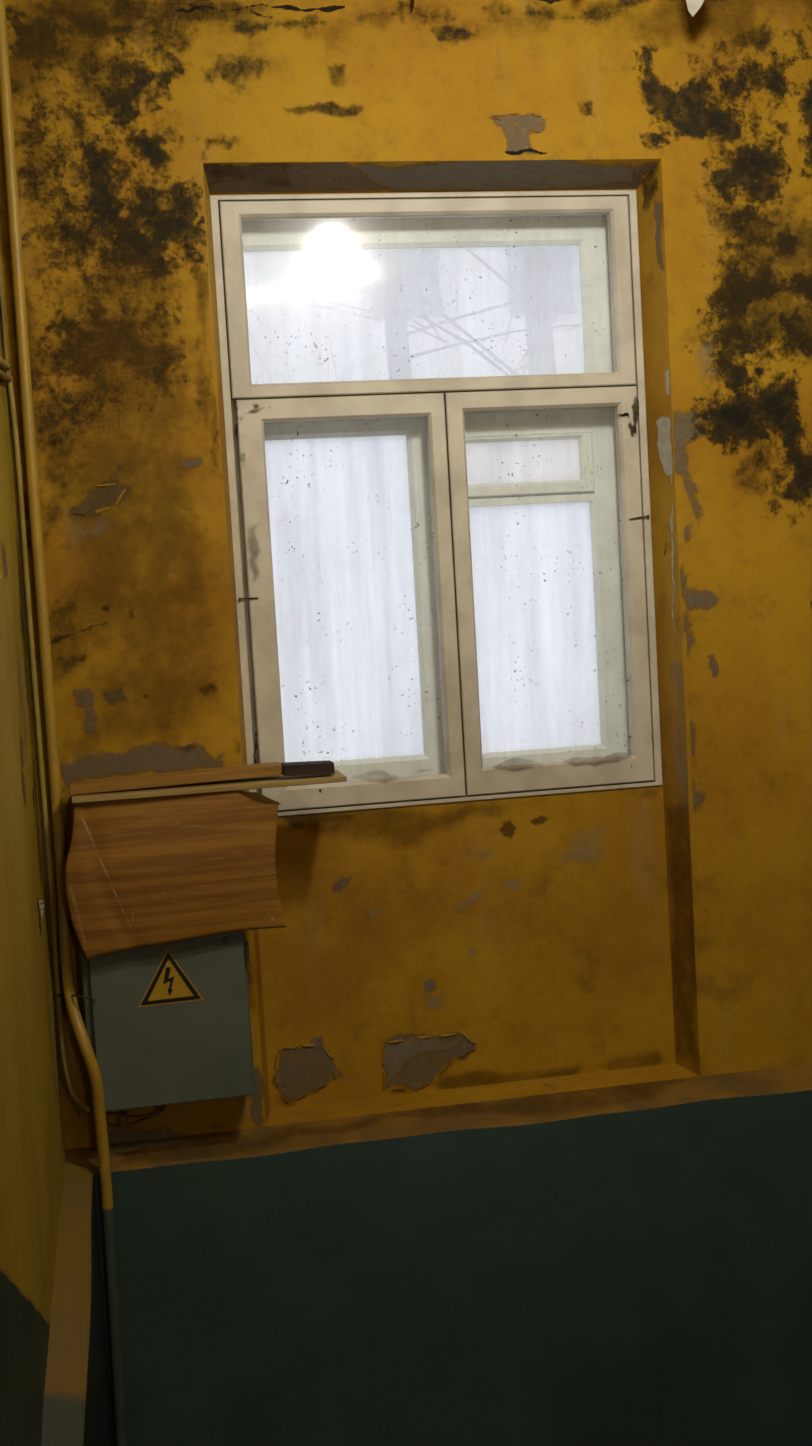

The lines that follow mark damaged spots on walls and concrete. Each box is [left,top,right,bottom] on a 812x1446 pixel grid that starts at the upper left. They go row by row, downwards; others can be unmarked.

leakage [438,18,472,41]
leakage [584,0,643,19]
peeling [686,0,704,17]
spalling [204,113,656,193]
leakage [5,0,317,488]
spalling [654,201,664,270]
leakage [635,25,812,514]
leakage [17,507,44,886]
spalling [250,1037,342,1126]
spalling [382,1032,476,1090]